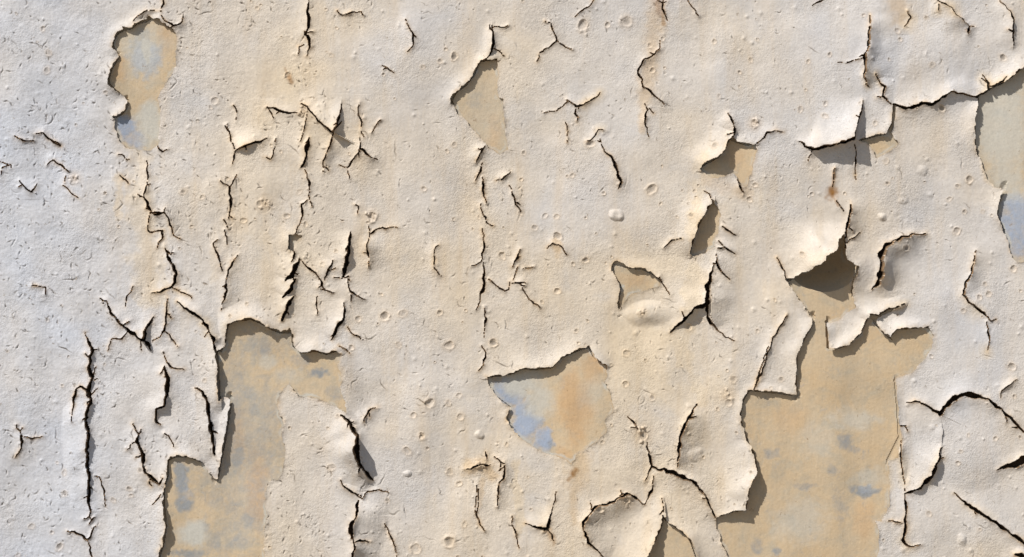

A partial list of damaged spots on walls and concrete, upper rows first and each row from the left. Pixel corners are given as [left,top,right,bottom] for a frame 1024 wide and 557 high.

peeling [101,10,177,151]
crack [544,92,623,189]
crack [637,0,699,137]
peeling [695,130,758,187]
peeling [966,55,1024,262]
crack [67,103,398,557]
peeling [152,306,346,557]
crack [471,145,567,371]
peeling [486,339,614,464]
crack [582,403,716,557]
peeling [716,230,933,557]
crack [888,379,1024,557]